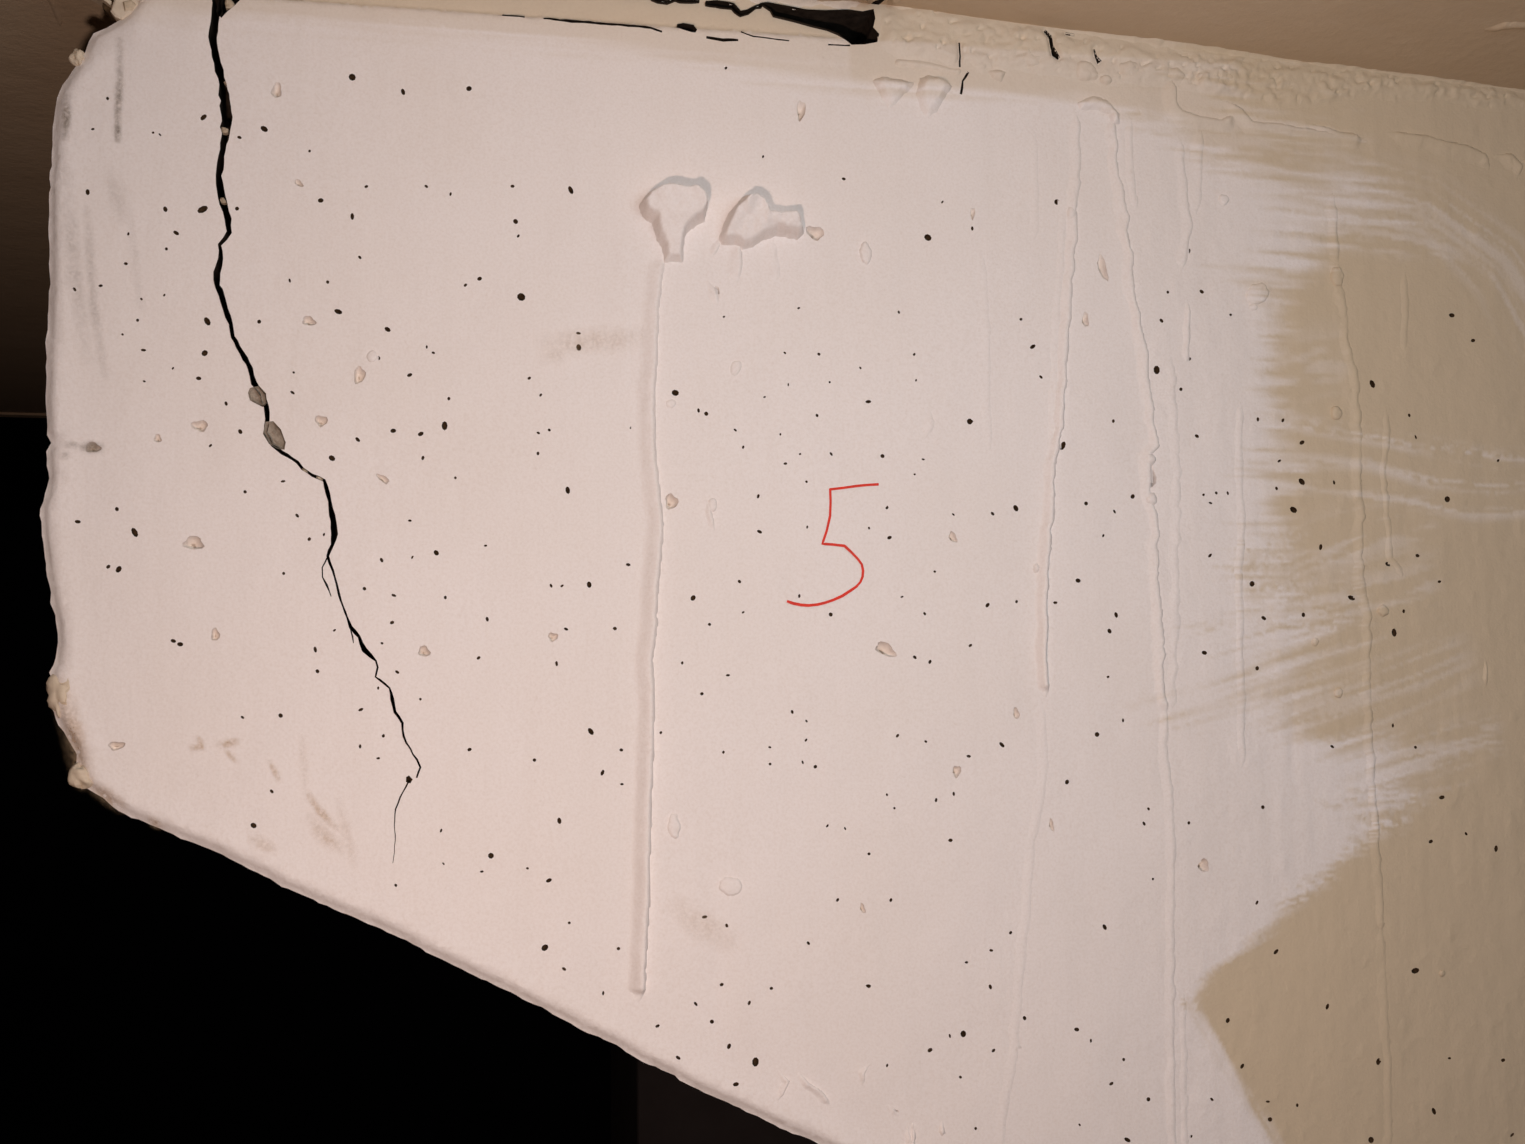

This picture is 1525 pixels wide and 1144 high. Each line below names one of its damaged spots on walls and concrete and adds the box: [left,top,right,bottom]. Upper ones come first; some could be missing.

crack [208,0,421,861]
crack [502,0,901,46]